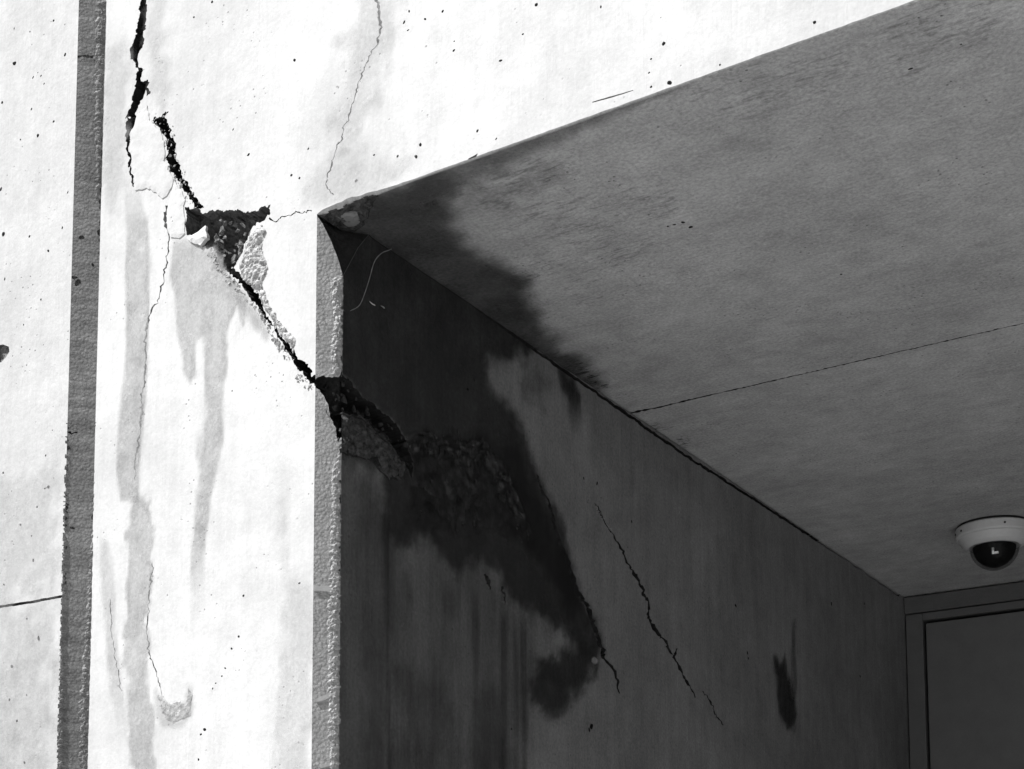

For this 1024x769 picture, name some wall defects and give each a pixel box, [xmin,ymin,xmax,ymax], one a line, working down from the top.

water stain [189,249,239,325]
crack [125,0,413,480]
water stain [118,390,149,524]
water stain [197,492,207,534]
water stain [320,175,601,717]
spalling [157,688,193,724]
crack [570,562,620,694]
crack [595,505,723,725]
water stain [774,658,796,727]